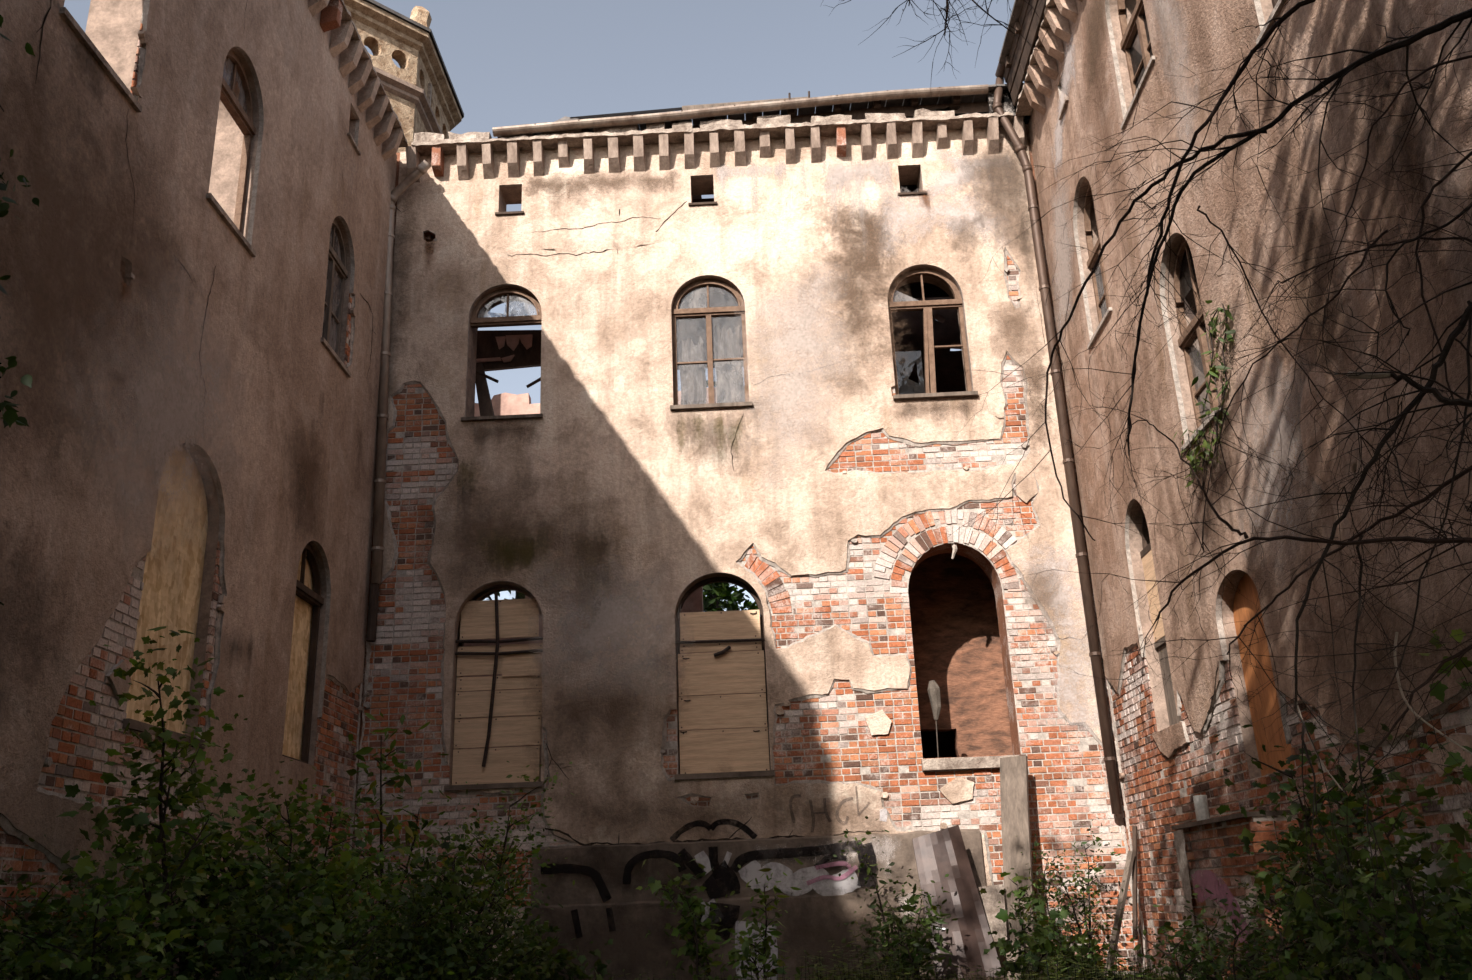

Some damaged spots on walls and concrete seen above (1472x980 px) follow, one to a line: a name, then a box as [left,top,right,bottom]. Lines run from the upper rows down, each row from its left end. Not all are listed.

crack [509,201,687,256]
damp [828,151,1024,333]
damp [458,505,597,616]
spalling [36,536,228,834]
spalling [310,381,577,935]
spalling [736,351,1472,979]
spalling [0,814,108,951]